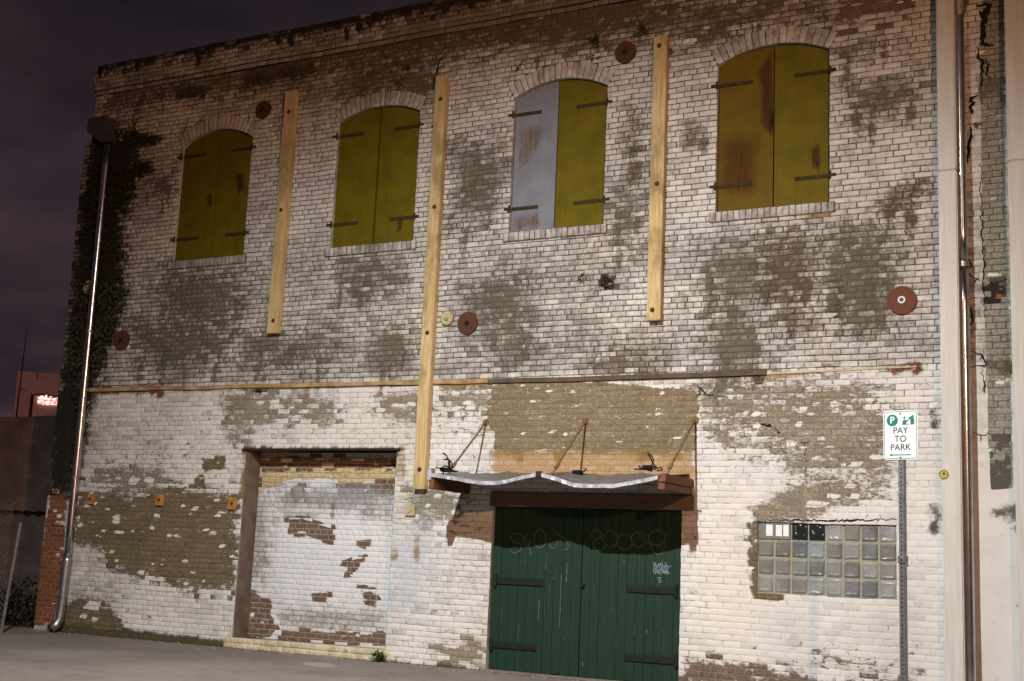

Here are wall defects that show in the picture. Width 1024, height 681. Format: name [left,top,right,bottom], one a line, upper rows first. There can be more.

rust [759,58,774,133]
leakage [832,35,931,148]
crack [966,3,994,325]
leakage [48,0,827,500]
leakage [697,178,931,405]
rust [888,363,922,375]
crack [971,351,987,393]
peeling [34,388,344,631]
peeling [258,453,472,545]
peeling [439,363,905,601]
peeling [247,589,386,646]
peeling [340,535,381,607]